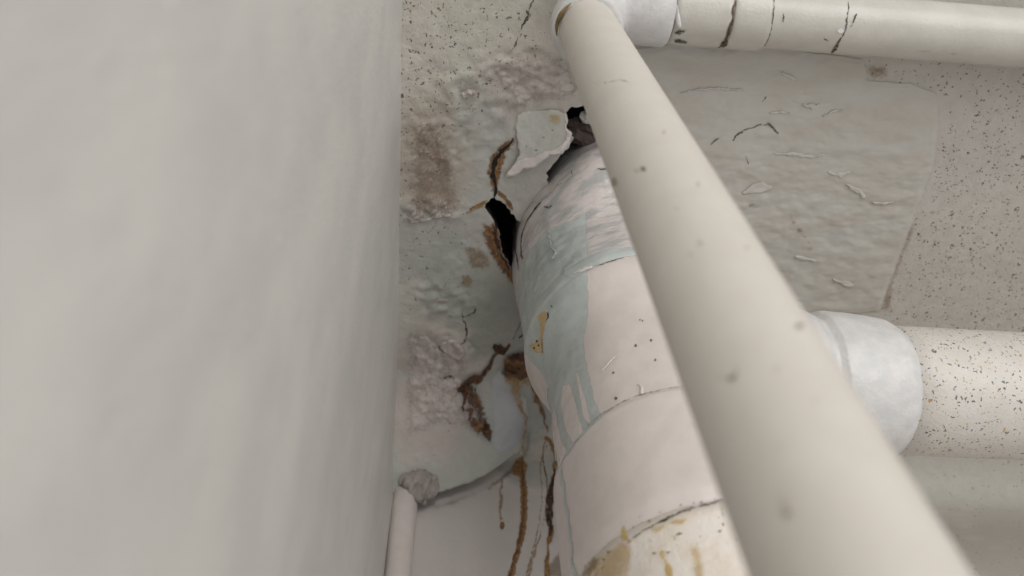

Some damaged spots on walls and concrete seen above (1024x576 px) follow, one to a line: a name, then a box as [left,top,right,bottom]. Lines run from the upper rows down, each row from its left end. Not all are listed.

peeling [506,109,596,177]
crack [711,97,778,164]
crack [469,138,606,258]
rust [462,223,513,287]
rust [457,343,557,576]